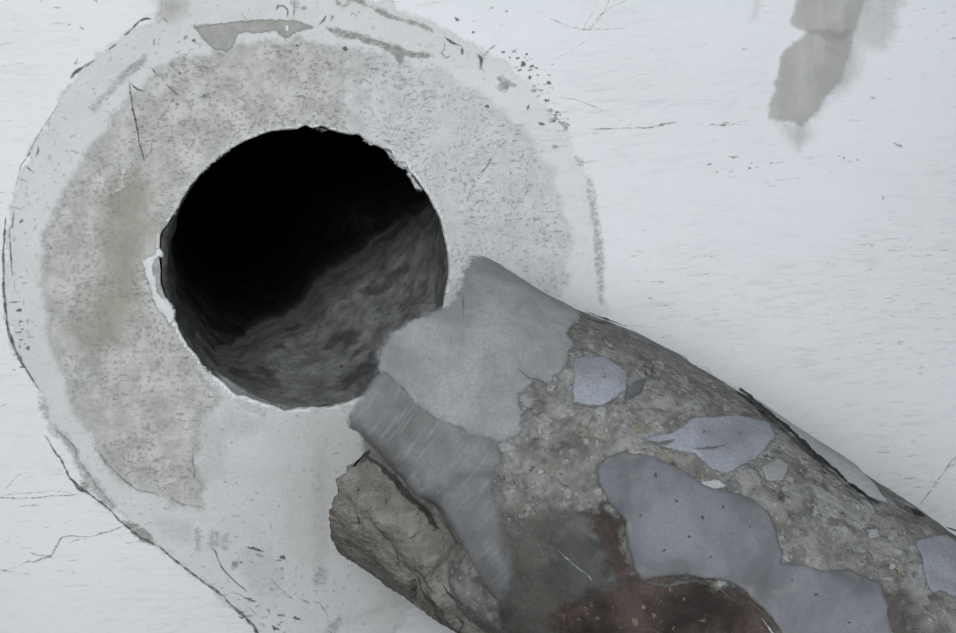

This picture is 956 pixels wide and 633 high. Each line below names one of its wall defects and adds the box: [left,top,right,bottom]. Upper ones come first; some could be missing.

damp [771,0,861,124]
damp [483,507,601,633]